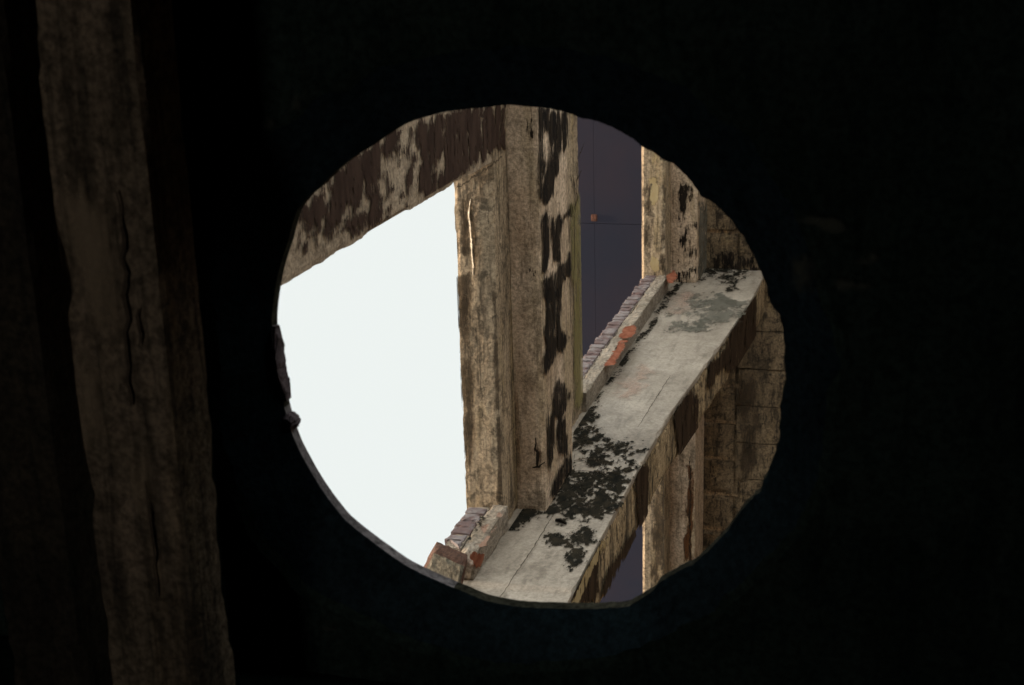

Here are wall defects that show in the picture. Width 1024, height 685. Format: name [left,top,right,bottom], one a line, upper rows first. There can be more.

damp [459,199,468,256]
damp [456,271,474,467]
damp [526,108,654,499]
damp [594,171,757,403]